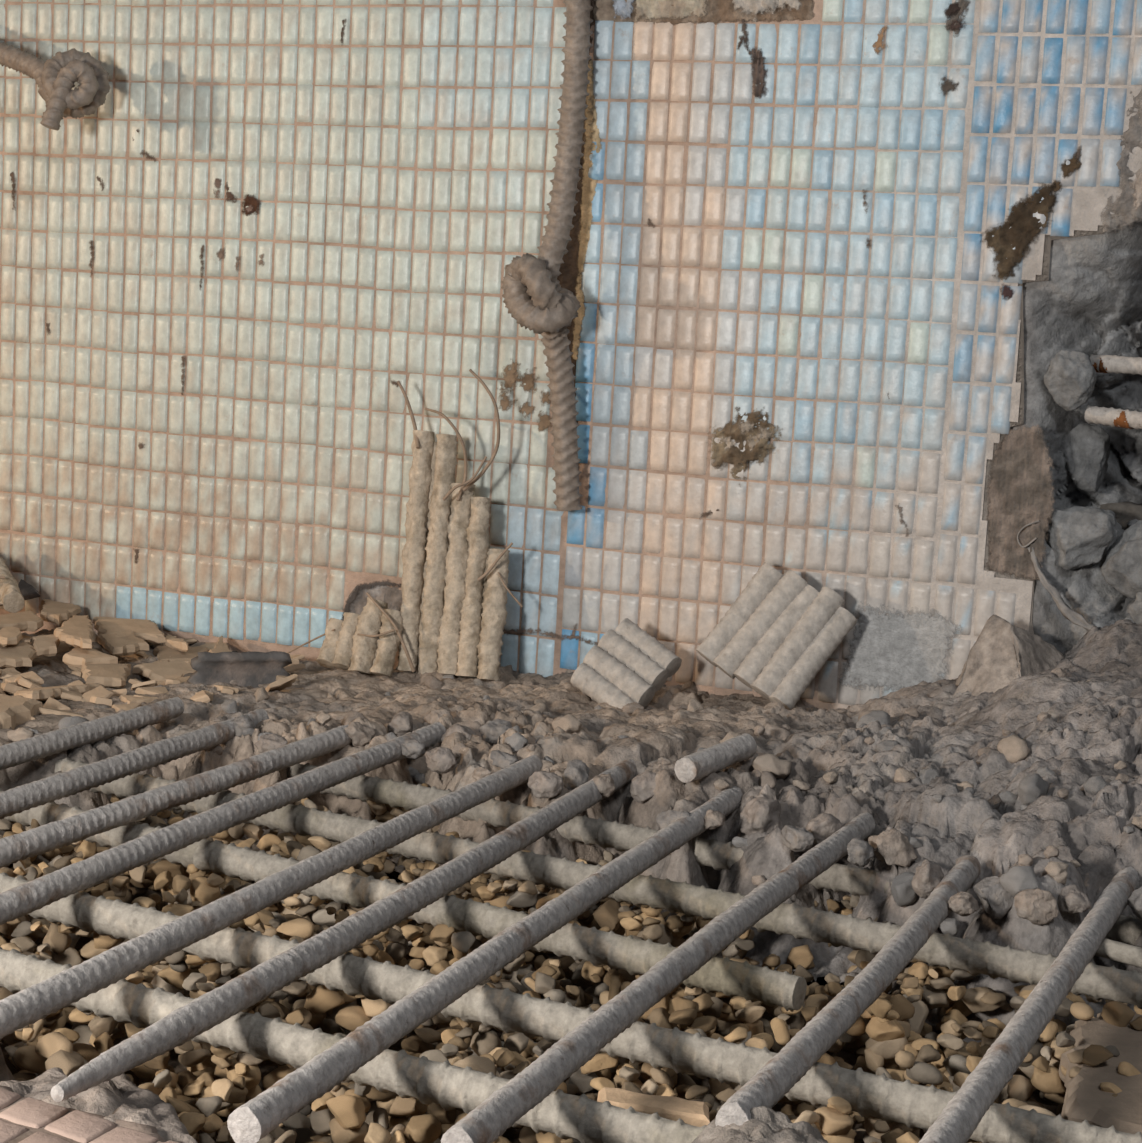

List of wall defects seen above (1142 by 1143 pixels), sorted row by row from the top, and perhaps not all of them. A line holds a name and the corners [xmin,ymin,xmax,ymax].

peeling [1101,89,1142,233]
spalling [501,0,815,511]
spalling [1085,405,1142,429]
spalling [1090,354,1142,375]
peeling [986,425,1055,580]
spalling [0,697,1142,1143]